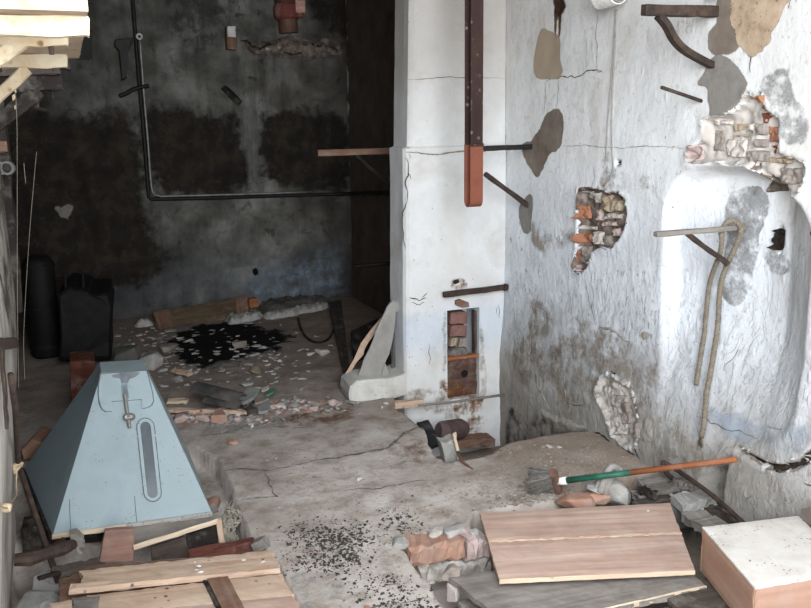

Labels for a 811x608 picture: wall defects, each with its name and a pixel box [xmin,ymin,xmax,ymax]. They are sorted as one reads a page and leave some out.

spalling [240,36,342,61]
flaking render [533,28,563,79]
flaking render [522,109,564,177]
damp [0,107,349,317]
spalling [562,187,628,284]
spalling [593,371,641,452]
crack [223,427,425,498]
crack [700,417,811,487]